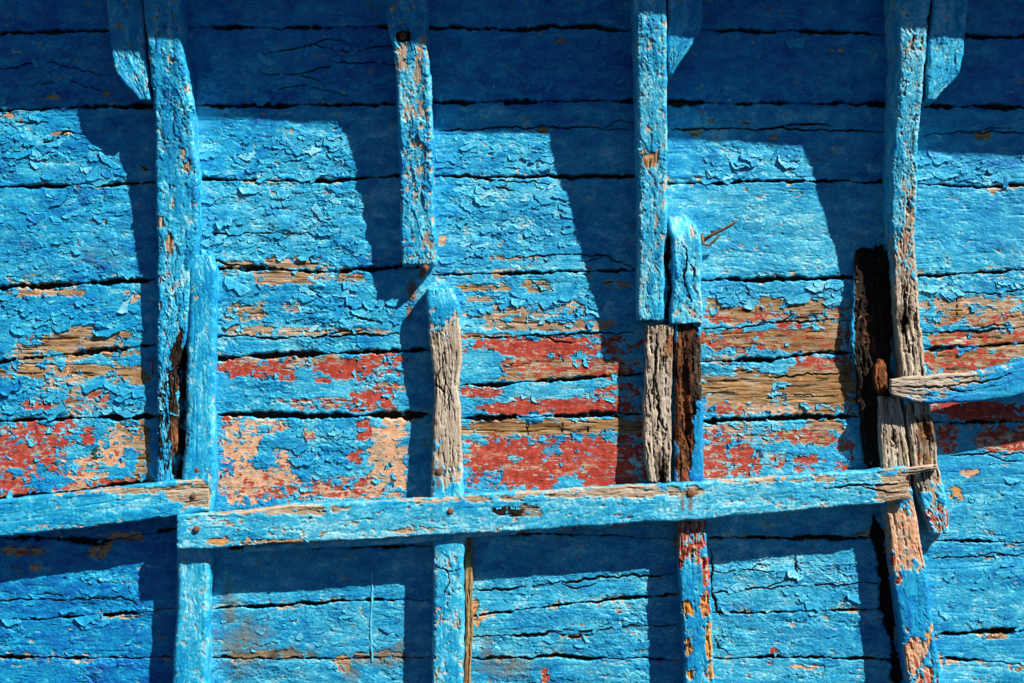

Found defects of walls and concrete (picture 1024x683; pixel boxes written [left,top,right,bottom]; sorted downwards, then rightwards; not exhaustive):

crack [260,39,395,96]
peeling [0,111,180,498]
peeling [217,351,412,506]
peeling [455,279,650,491]
crack [648,233,695,451]
peeling [700,279,858,480]
peeling [918,275,1024,374]
peeling [930,400,1024,525]
crack [479,574,668,591]
crack [476,624,675,638]
peeling [680,556,735,681]
crack [710,552,881,652]